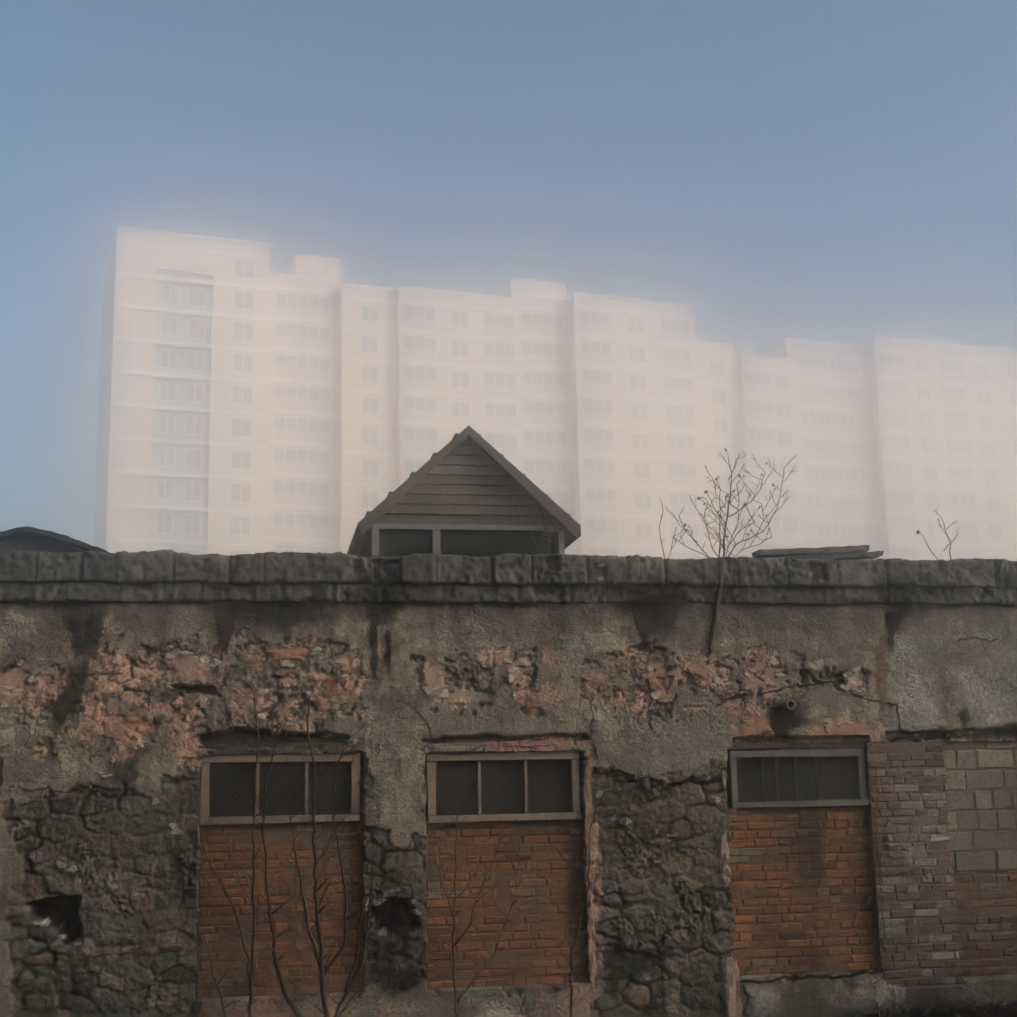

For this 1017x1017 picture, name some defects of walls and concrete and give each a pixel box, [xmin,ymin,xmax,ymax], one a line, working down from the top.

water stain [626,574,687,655]
water stain [879,580,914,651]
flaking render [0,660,35,708]
water stain [52,607,105,728]
flaking render [165,651,221,693]
flaking render [237,688,277,719]
flaking render [421,658,449,699]
flaking render [632,654,671,704]
flaking render [839,666,867,693]
crack [716,669,1017,743]
crack [957,628,998,664]
crack [740,969,889,1017]